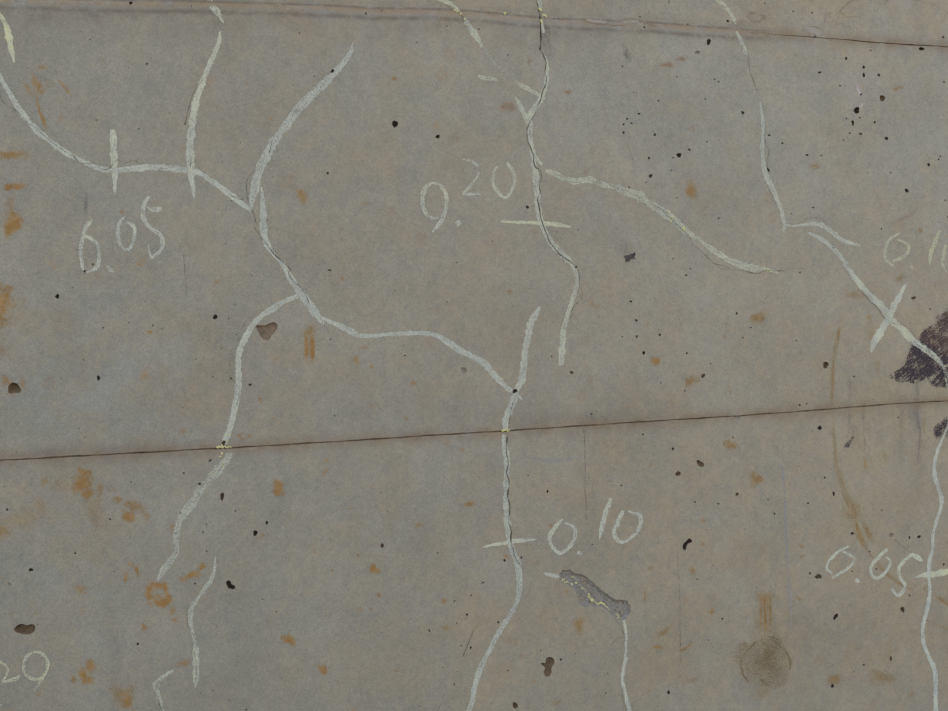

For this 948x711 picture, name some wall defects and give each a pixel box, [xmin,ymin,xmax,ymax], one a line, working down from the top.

crack [231,143,312,303]
crack [527,0,583,317]
rust [49,466,151,533]
rust [145,561,206,623]